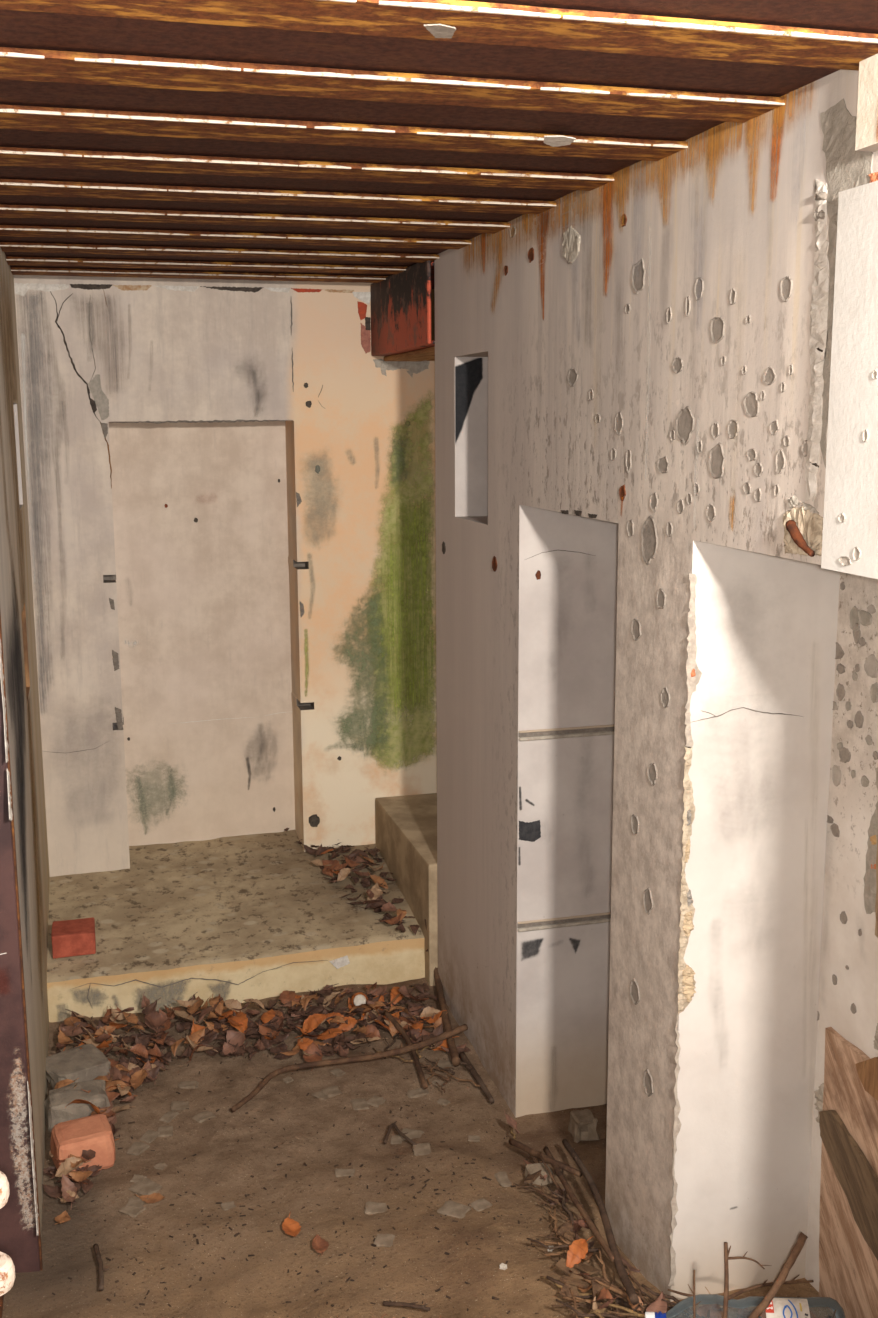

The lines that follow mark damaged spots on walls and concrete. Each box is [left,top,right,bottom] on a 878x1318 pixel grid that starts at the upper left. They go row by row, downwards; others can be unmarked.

rust [466,82,812,320]
spalling [562,226,581,264]
flaking render [567,99,878,566]
crack [50,289,112,489]
spalling [631,618,641,641]
crack [693,707,802,722]
flaking render [832,604,878,914]
spalling [827,815,840,837]
spalling [643,888,653,915]
spalling [661,573,702,1286]
spalling [840,911,862,936]
spalling [643,1069,653,1097]